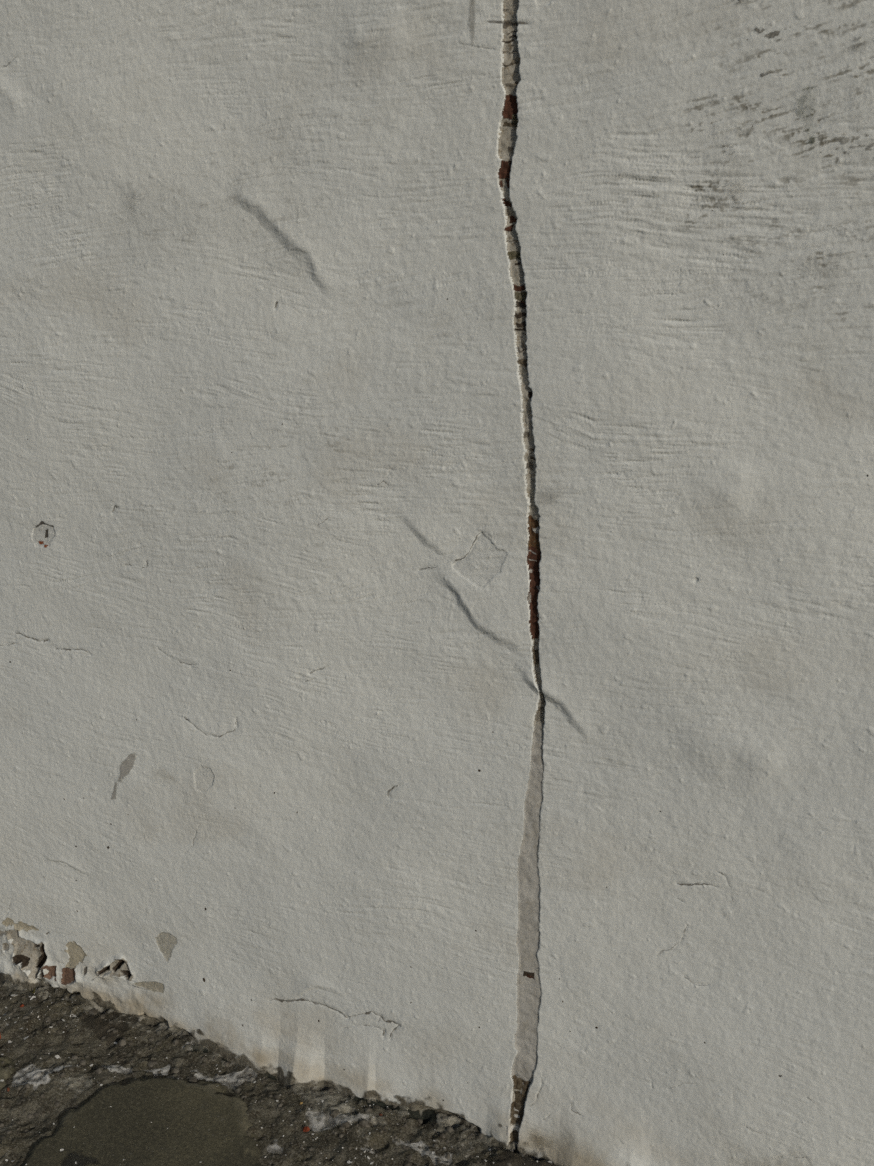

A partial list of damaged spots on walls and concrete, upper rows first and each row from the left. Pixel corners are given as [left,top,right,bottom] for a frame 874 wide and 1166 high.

spalling [0,917,164,993]
crack [498,0,546,1152]